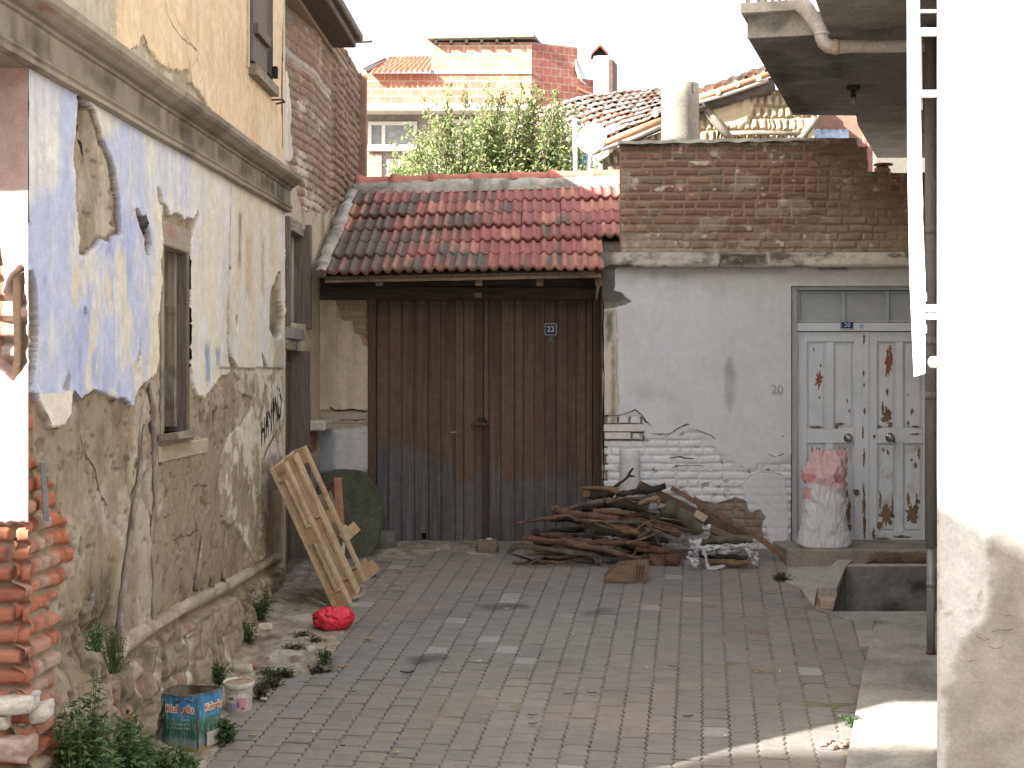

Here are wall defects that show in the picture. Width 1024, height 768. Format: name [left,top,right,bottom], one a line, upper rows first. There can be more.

peeling [63,0,117,40]
peeling [131,37,211,109]
spalling [73,96,118,256]
spalling [135,210,149,253]
spalling [269,278,285,376]
crack [602,299,784,488]
peeling [694,496,765,538]